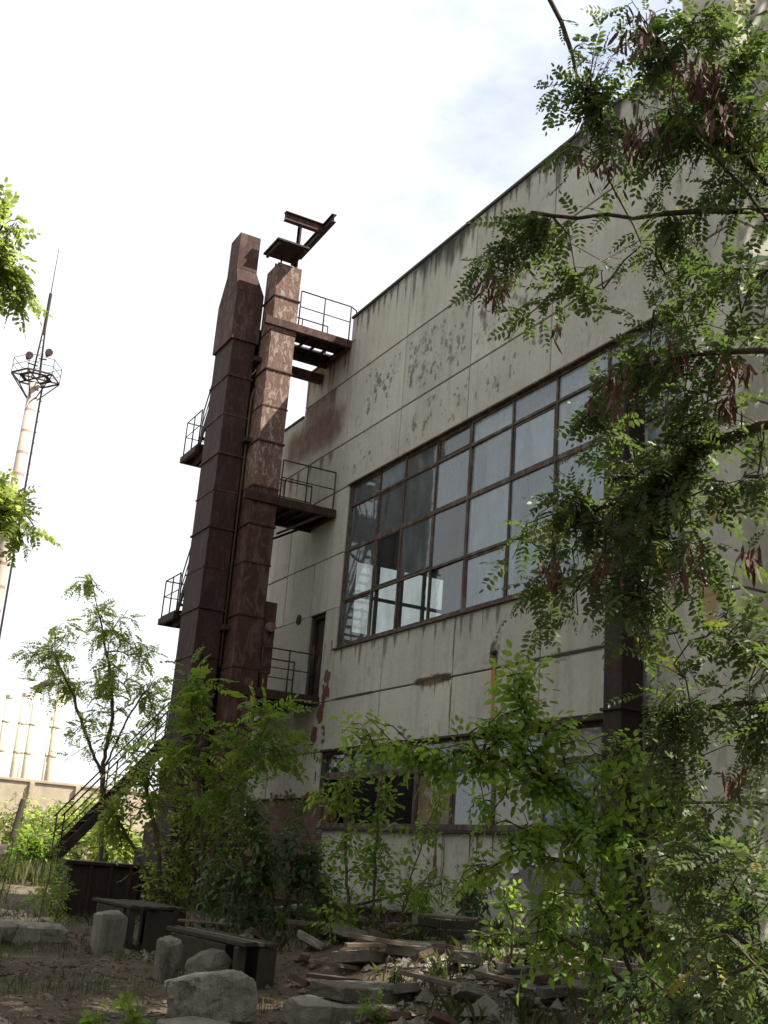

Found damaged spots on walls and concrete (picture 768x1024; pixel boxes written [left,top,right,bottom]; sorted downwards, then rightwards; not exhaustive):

leakage [357,130,597,325]
rust [289,351,350,464]
spalling [515,645,604,665]
spalling [310,685,372,746]